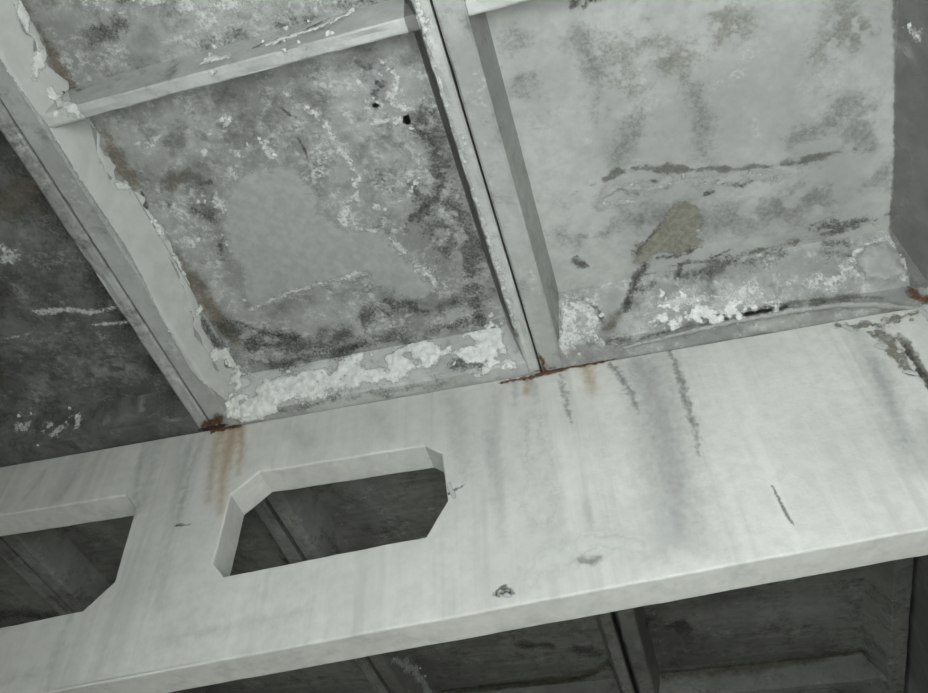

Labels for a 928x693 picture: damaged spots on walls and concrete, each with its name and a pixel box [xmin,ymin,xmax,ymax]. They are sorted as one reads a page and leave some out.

water stain [17,0,30,33]
water stain [81,0,166,45]
water stain [31,38,80,119]
water stain [160,173,227,222]
water stain [171,0,518,423]
water stain [0,244,22,264]
water stain [32,266,139,340]
water stain [555,294,631,357]
water stain [639,249,848,332]
corrosion [499,354,616,384]
crack [898,333,928,385]
corrosion [199,415,242,434]